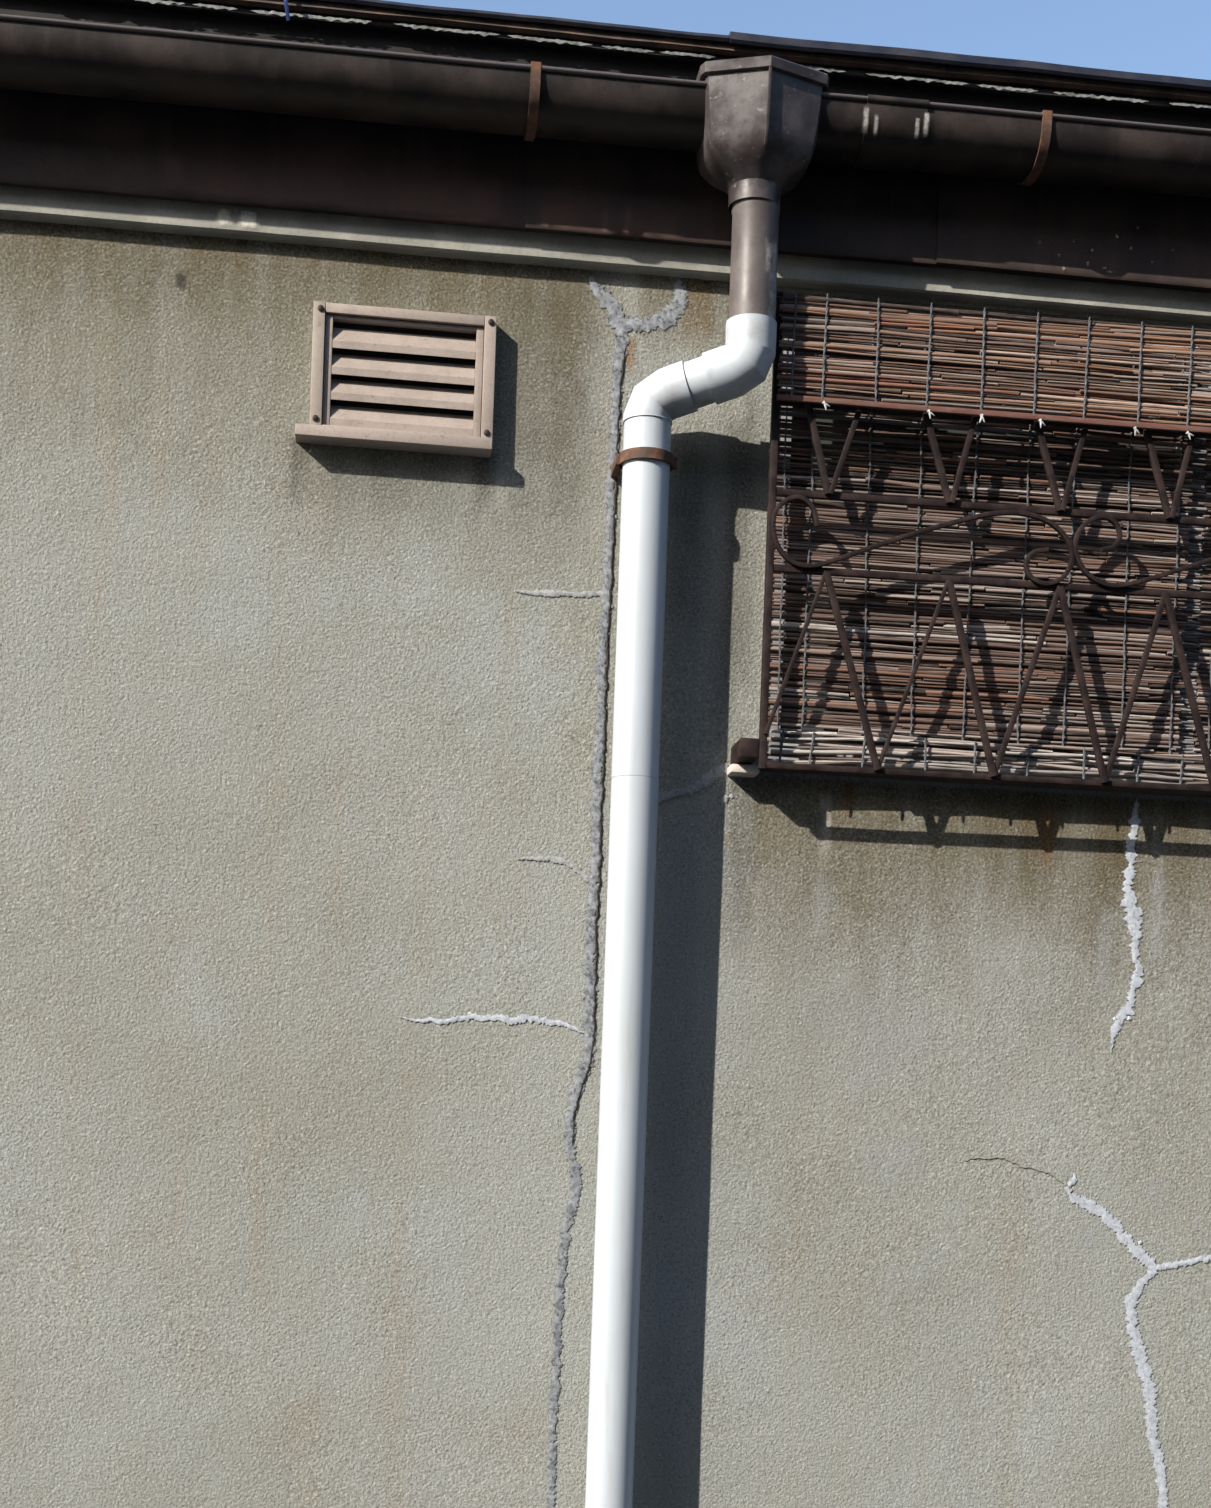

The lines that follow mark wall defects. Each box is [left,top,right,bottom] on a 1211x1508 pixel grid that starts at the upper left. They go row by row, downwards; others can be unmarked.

crack [400,275,688,1508]
crack [1110,799,1144,1052]
crack [964,1156,1211,1508]